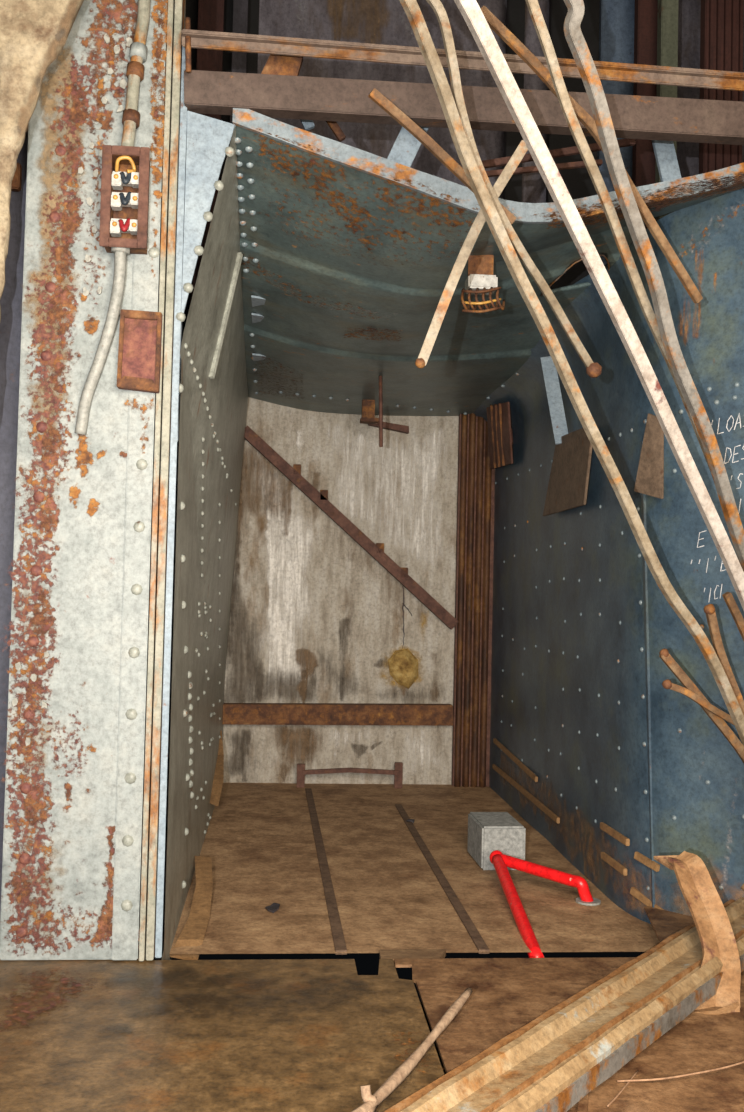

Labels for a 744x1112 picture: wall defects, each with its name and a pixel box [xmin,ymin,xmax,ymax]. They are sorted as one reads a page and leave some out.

rust [254,128,477,265]
rust [533,211,566,229]
rust [576,198,624,225]
rust [640,172,744,211]
rust [2,0,168,955]
leakage [229,731,250,772]
leakage [278,727,317,776]